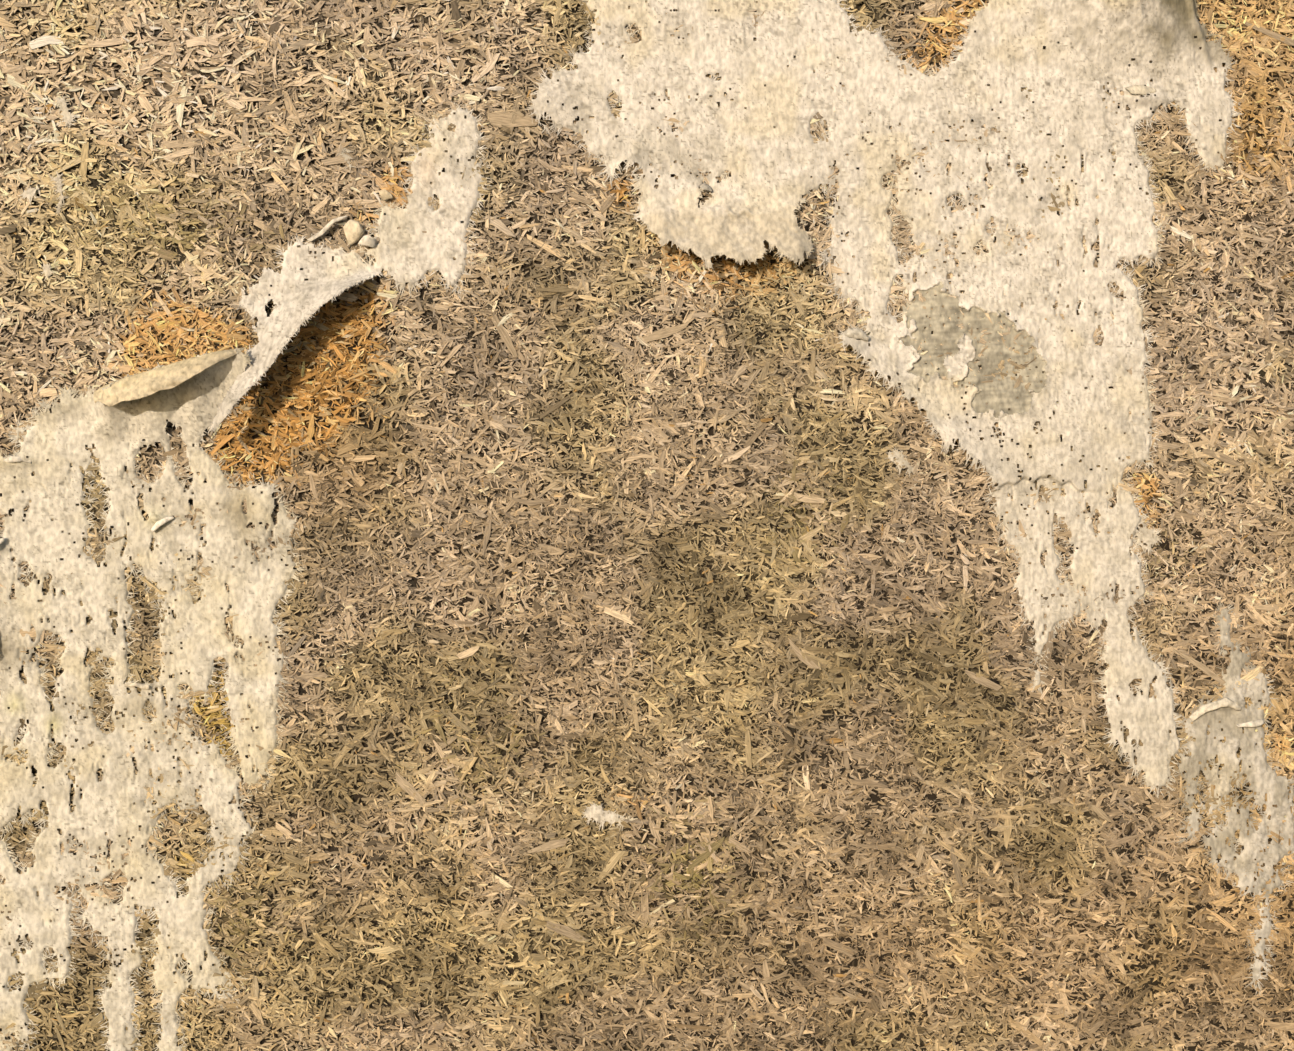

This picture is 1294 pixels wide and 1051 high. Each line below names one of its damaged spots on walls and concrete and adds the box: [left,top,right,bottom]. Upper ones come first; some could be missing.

peeling [18,171,68,215]
peeling [40,263,53,281]
peeling [885,447,914,476]
peeling [1134,523,1162,555]